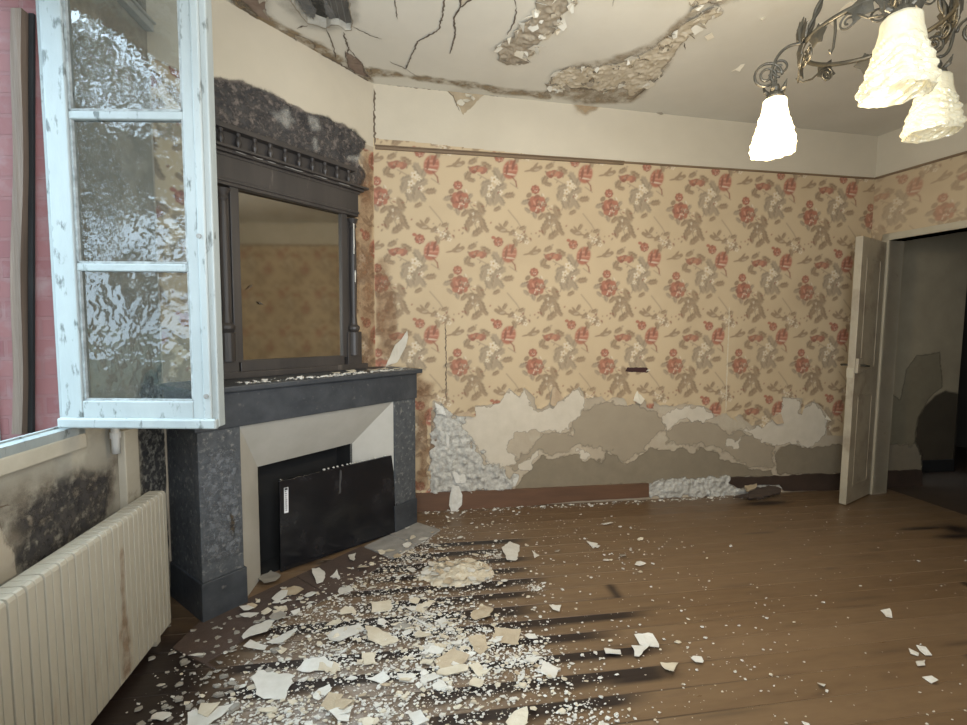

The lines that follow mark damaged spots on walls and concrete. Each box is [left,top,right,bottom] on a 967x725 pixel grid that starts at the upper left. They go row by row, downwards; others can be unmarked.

peeling [241,0,270,21]
crack [242,8,380,146]
peeling [345,51,371,79]
crack [391,0,472,111]
peeling [494,0,577,65]
peeling [545,0,723,96]
damp [16,472,110,570]
peeling [428,389,585,518]
peeling [662,405,714,430]
flaking render [649,475,781,498]
peeling [726,398,827,449]
peeling [890,352,942,447]